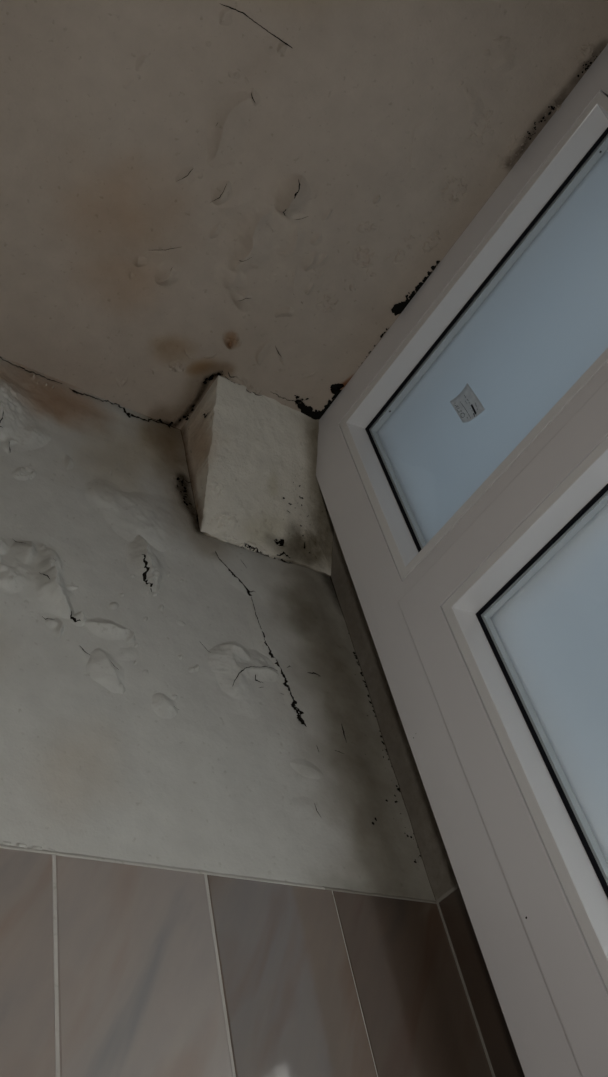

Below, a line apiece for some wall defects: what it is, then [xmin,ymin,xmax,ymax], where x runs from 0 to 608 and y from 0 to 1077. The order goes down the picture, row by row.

crack [205,533,347,754]